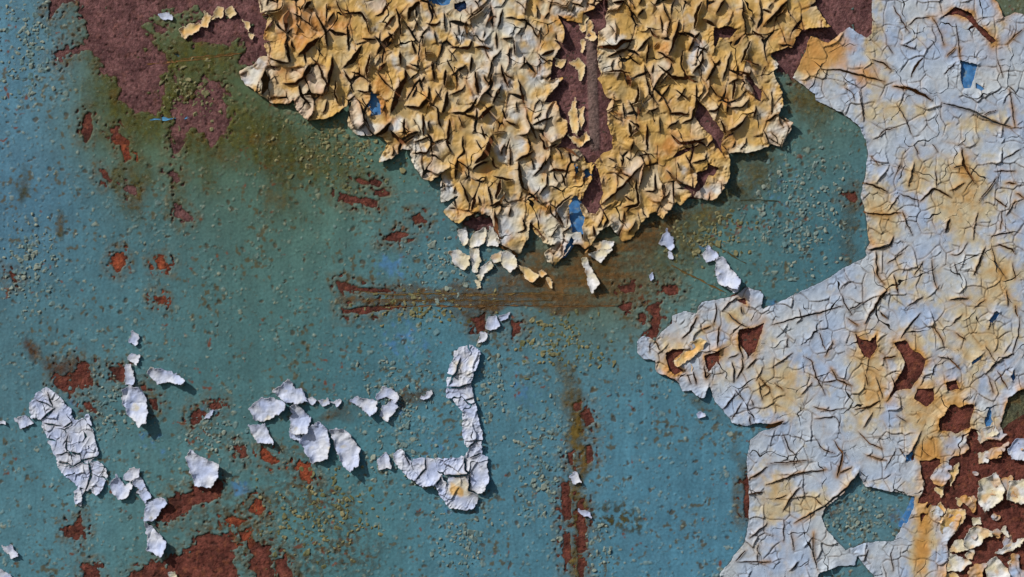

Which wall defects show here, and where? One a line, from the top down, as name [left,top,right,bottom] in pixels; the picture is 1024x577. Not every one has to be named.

rust [44,0,390,213]
crack [262,0,798,257]
peeling [0,330,185,559]
rust [126,475,299,577]
rust [415,214,692,340]
rust [555,389,642,577]
peeling [239,0,1024,577]
rust [666,349,686,381]
rust [733,323,764,357]
crack [683,7,1023,570]
rust [852,331,877,365]
rust [890,334,1024,577]